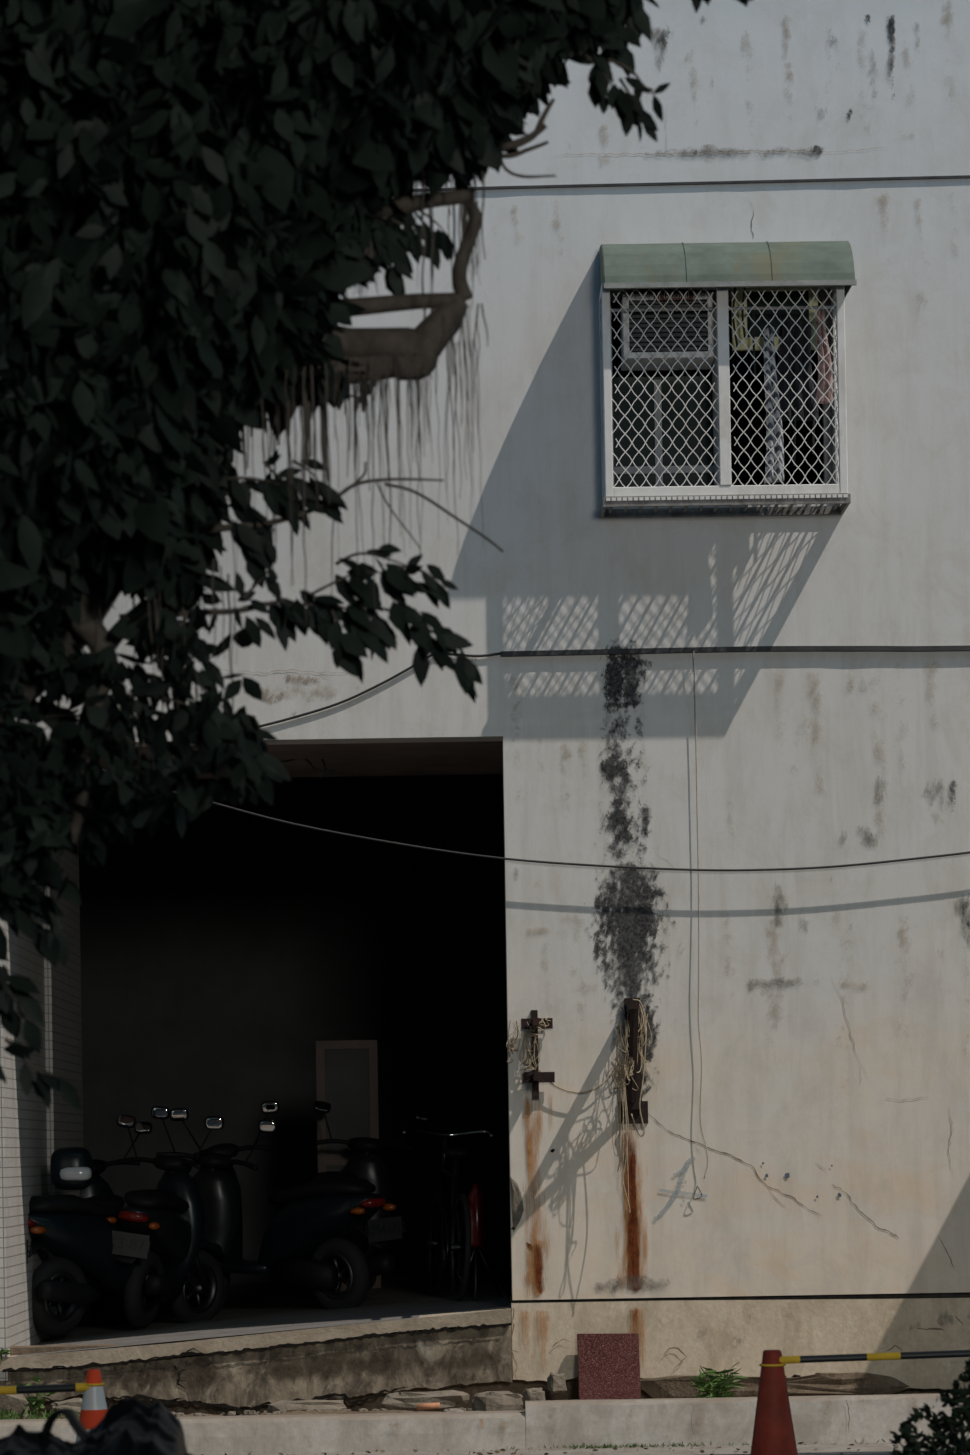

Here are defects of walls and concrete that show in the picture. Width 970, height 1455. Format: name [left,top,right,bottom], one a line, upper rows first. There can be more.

damp [887,15,895,96]
damp [594,640,675,1097]
corrosion [522,1101,552,1336]
corrosion [620,1132,647,1342]
crack [648,1113,899,1239]